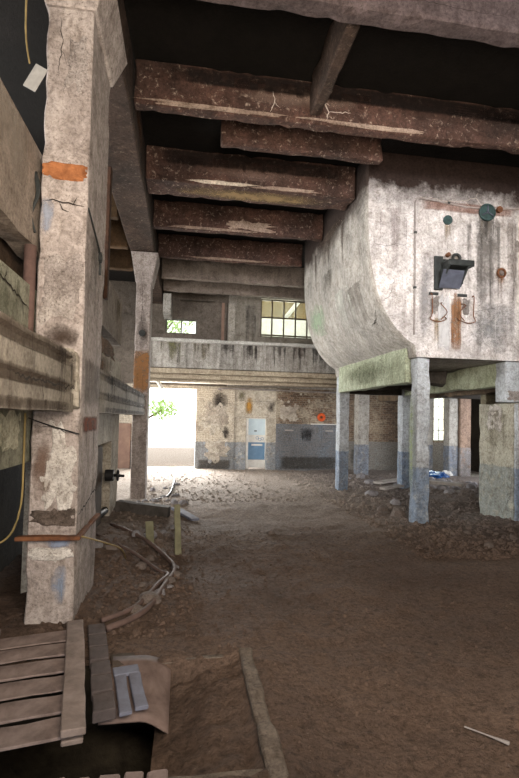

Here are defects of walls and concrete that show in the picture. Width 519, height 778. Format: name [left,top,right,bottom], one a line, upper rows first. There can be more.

crack [49,198,104,281]
rust [451,293,462,346]
peeling [0,410,21,452]
flaking render [198,400,233,463]
flaking render [278,389,312,422]